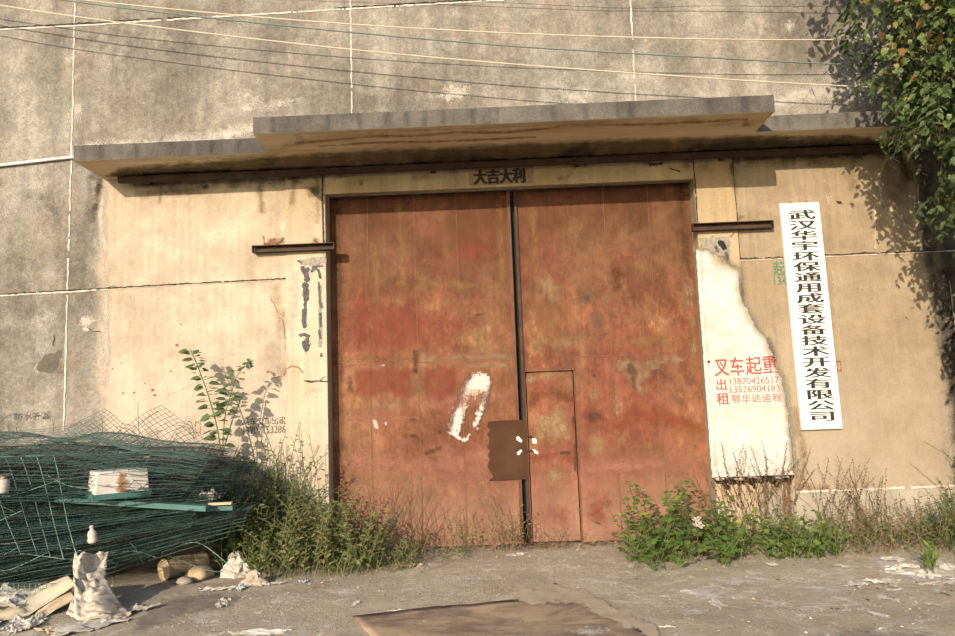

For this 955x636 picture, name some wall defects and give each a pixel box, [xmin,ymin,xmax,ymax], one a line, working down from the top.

damp [91,119,955,354]
spalling [699,232,734,260]